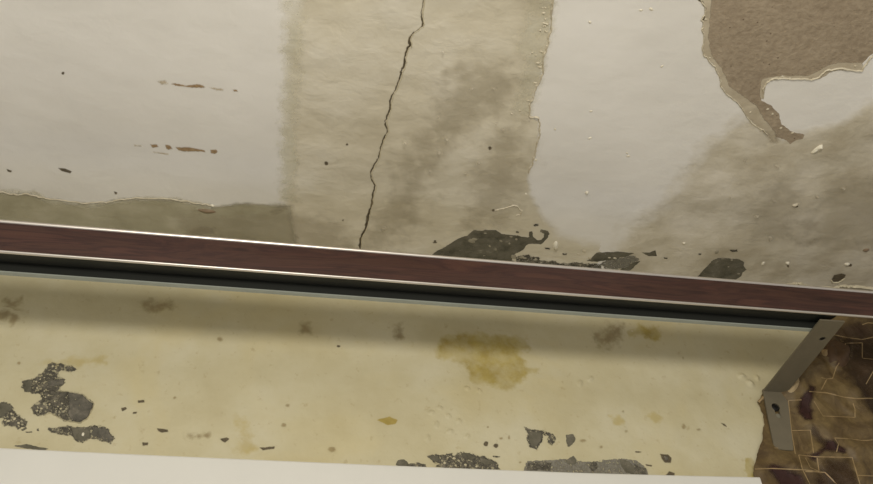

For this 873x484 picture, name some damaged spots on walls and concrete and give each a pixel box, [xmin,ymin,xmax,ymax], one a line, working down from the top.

peeling [699,0,873,144]
corrosion [151,145,217,154]
crack [359,0,425,249]
water stain [0,0,873,291]
spalling [432,224,667,271]
spalling [698,250,747,280]
water stain [430,328,544,396]
spalling [0,362,115,444]
spalling [396,441,500,470]
spalling [524,427,648,475]